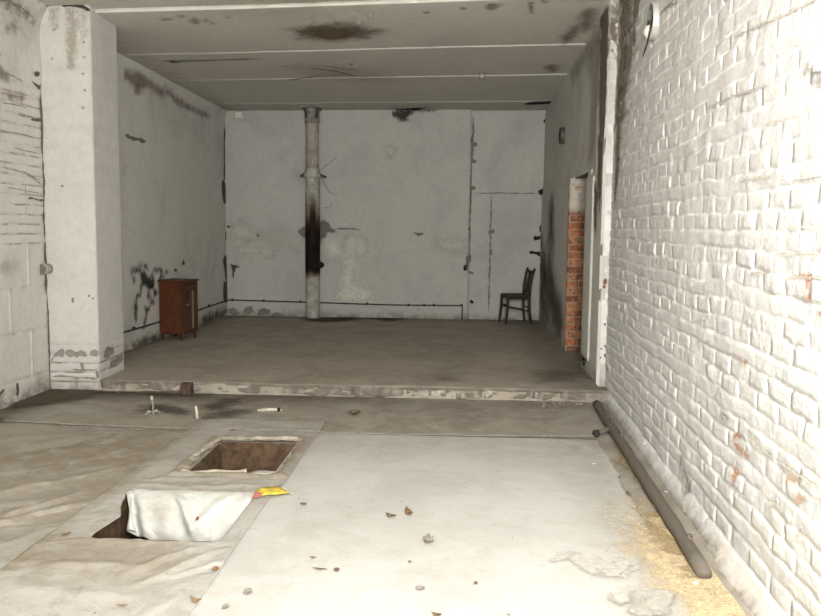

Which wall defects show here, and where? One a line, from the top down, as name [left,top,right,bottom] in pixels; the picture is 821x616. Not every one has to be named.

damp [584,0,640,233]
damp [132,259,185,347]
damp [305,207,320,275]
peeling [320,221,371,301]
damp [540,202,562,333]
spalling [610,587,675,616]